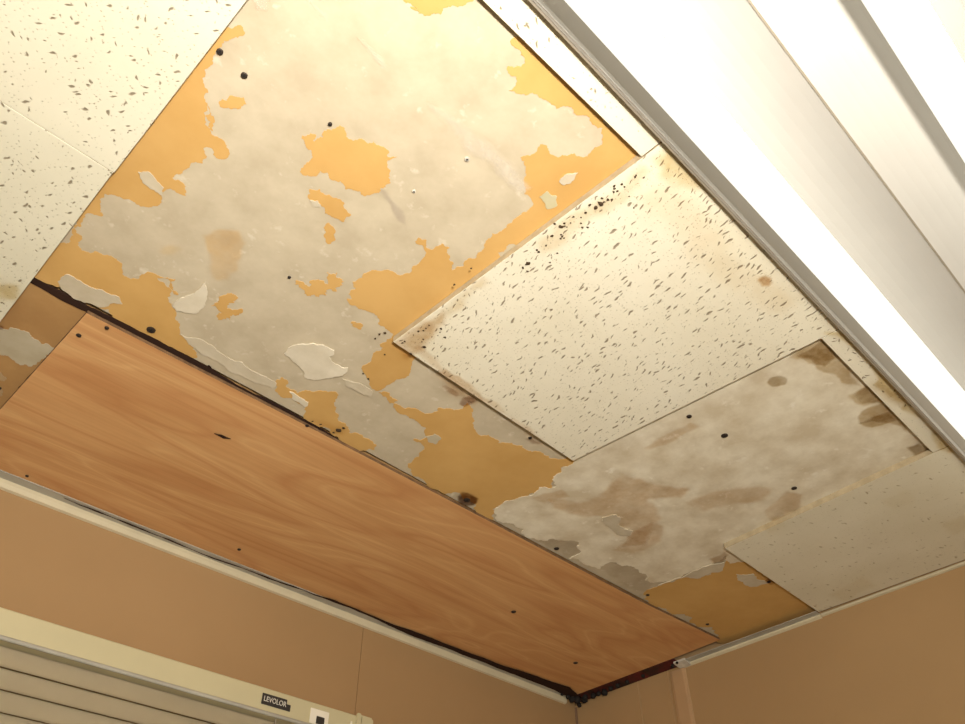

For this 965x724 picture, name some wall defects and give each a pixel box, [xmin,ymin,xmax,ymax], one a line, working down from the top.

peeling [403,0,474,16]
leakage [536,183,635,263]
peeling [0,327,54,367]
peeling [35,25,928,644]